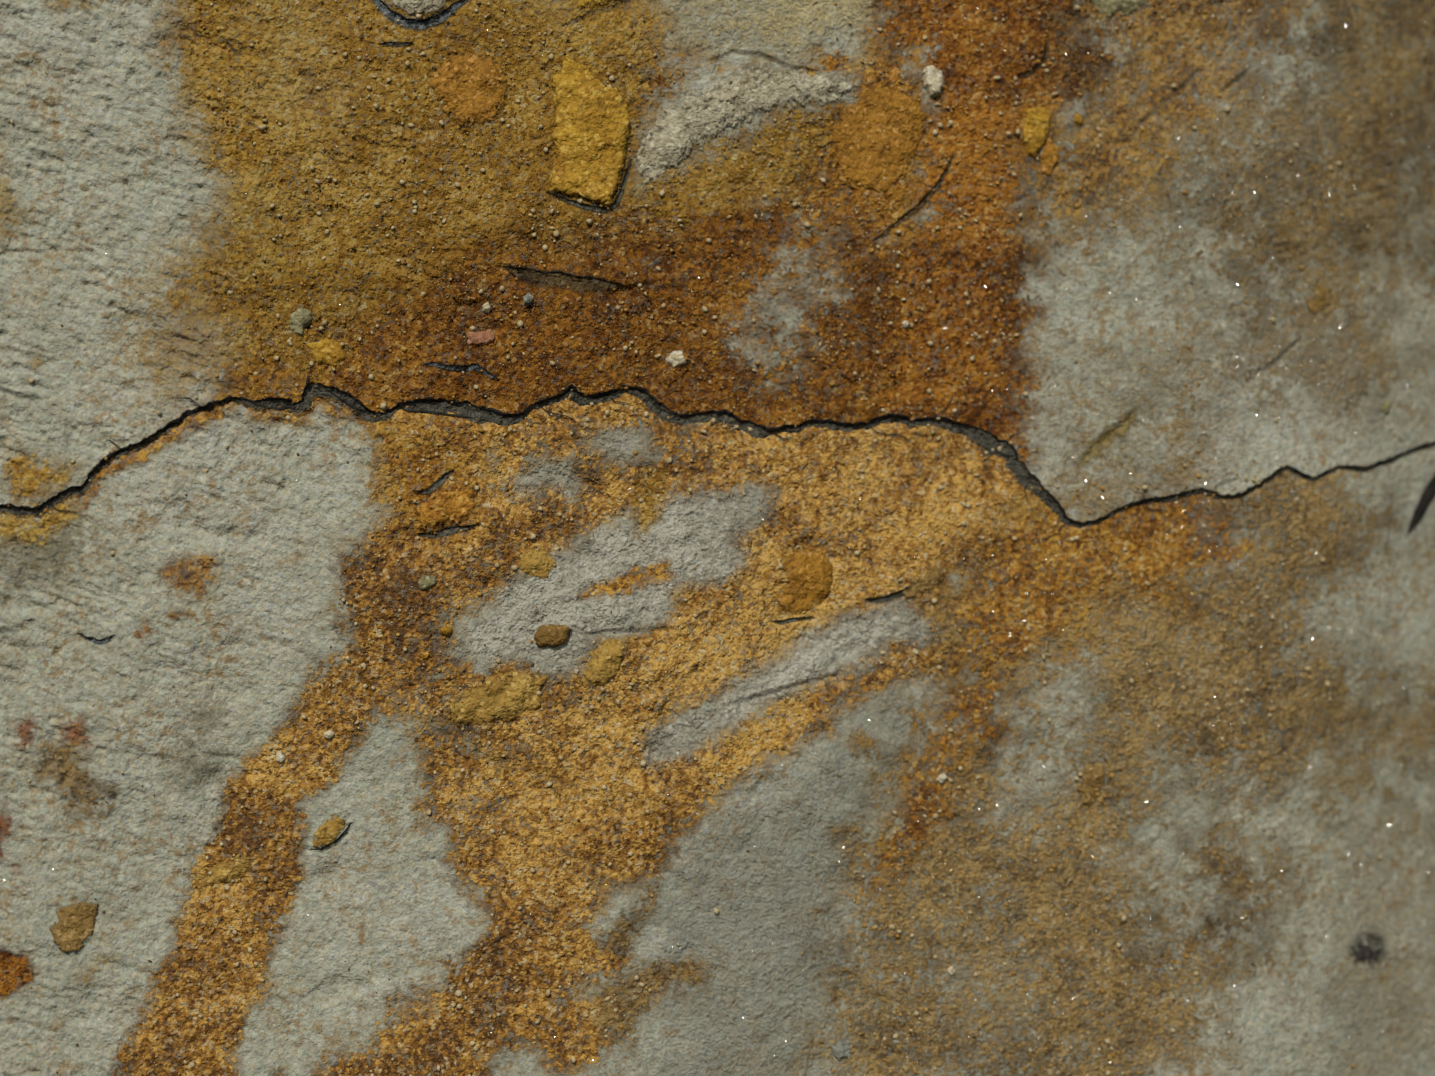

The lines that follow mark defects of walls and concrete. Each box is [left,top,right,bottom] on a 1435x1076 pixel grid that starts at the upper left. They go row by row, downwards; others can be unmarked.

rust [15,717,116,817]
crack [0,361,1435,546]
rust [110,393,1398,1076]
rust [168,0,1435,462]
peeling [620,0,1435,1076]